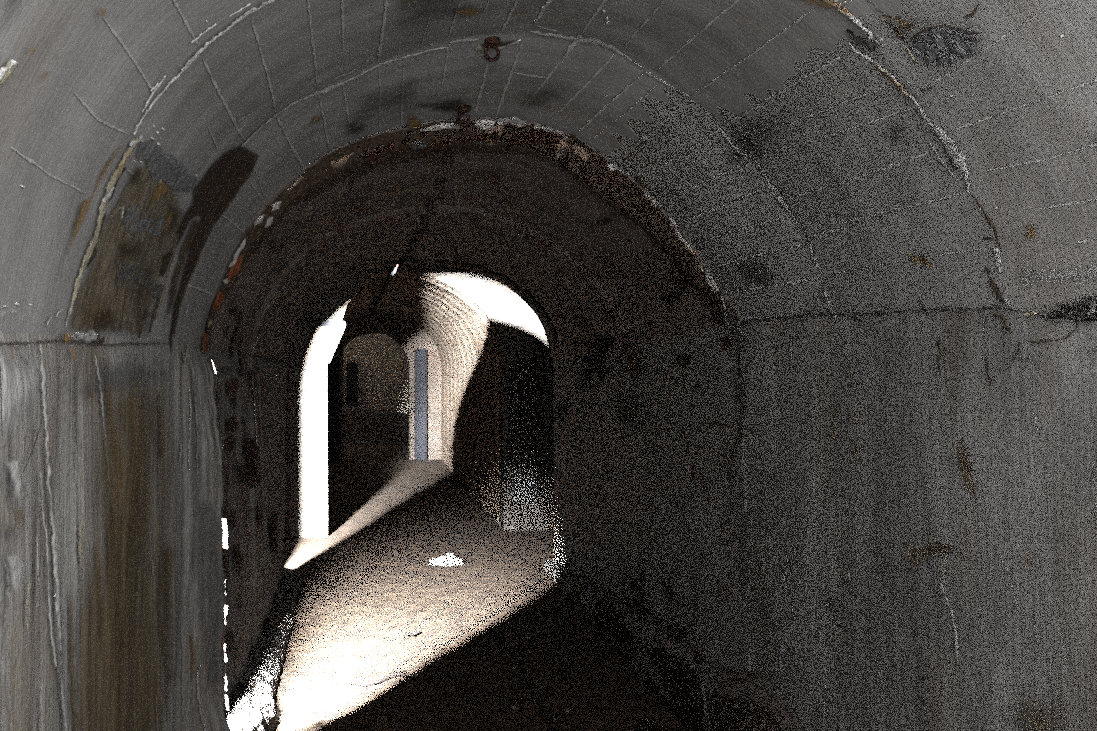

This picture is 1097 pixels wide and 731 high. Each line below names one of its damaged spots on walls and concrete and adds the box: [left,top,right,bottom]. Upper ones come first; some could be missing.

leakage [66,0,276,327]
leakage [139,36,478,474]
spalling [202,117,747,493]
crack [699,195,1081,524]
spalling [905,3,983,66]
spalling [1022,287,1097,321]
leakage [0,344,207,731]